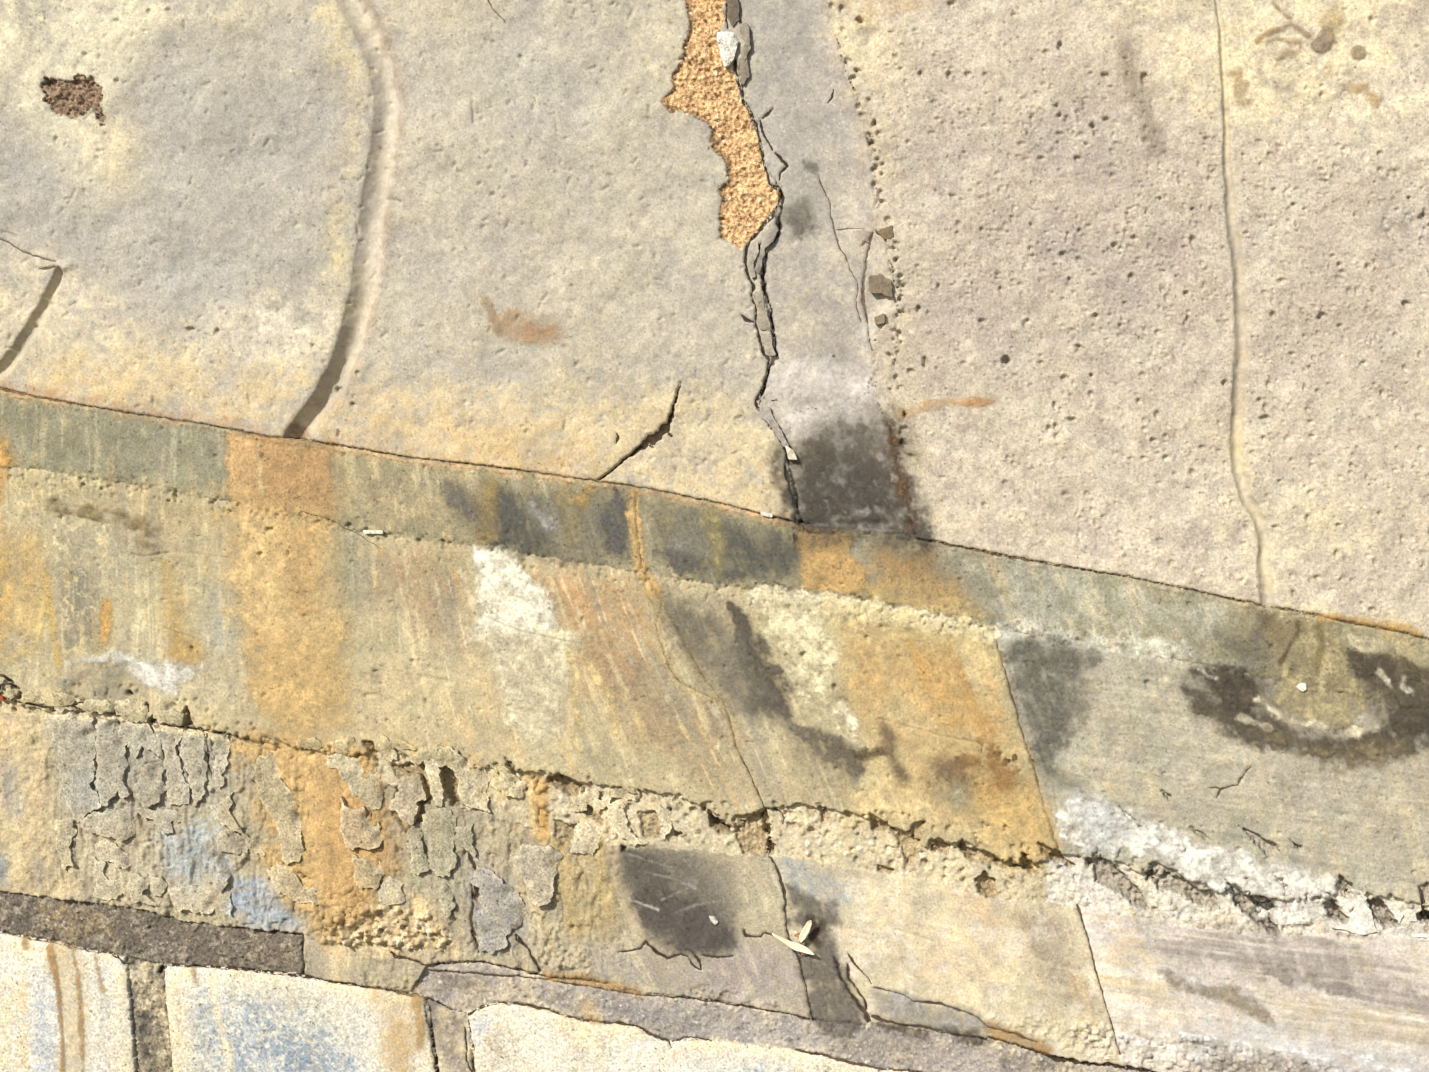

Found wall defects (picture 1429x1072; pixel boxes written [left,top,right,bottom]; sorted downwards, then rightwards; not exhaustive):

spalling [660,0,781,356]
crack [725,0,874,411]
water stain [773,413,930,547]
corrosion [47,943,84,1072]
peeling [2,686,322,916]
peeling [297,736,683,954]
water stain [446,483,642,747]
crack [0,384,1427,1072]
water stain [653,508,1099,790]
spalling [871,815,1305,936]
water stain [1182,615,1429,765]
spalling [1316,871,1429,938]